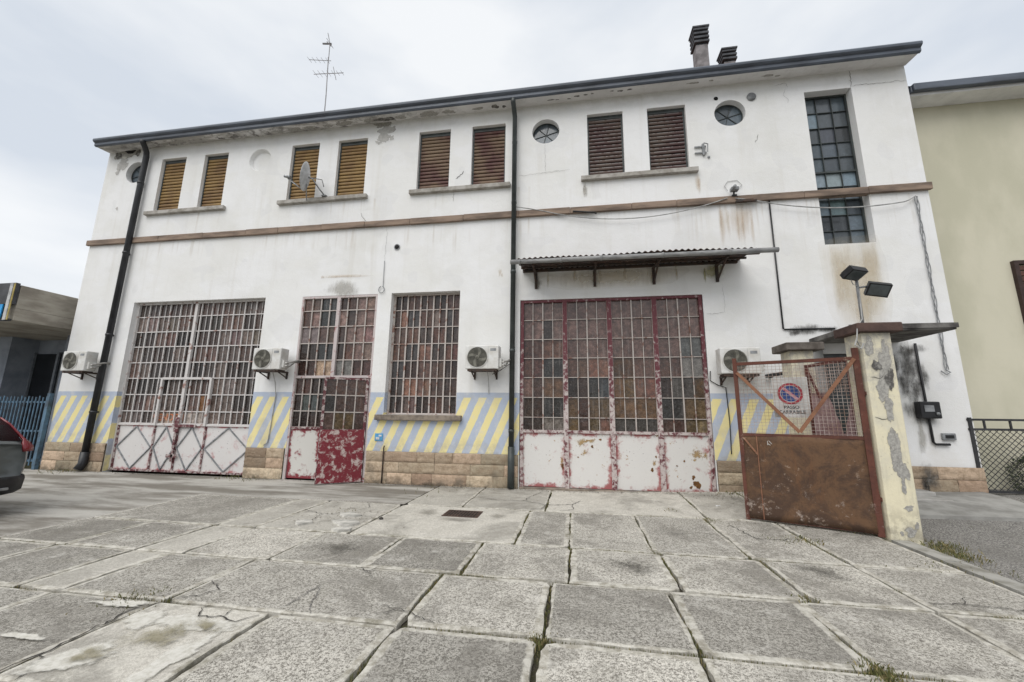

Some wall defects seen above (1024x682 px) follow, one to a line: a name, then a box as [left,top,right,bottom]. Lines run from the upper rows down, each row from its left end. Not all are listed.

spalling [114,149,141,175]
spalling [364,115,406,144]
peeling [864,335,919,538]
leakage [894,348,928,445]
crack [0,582,320,681]